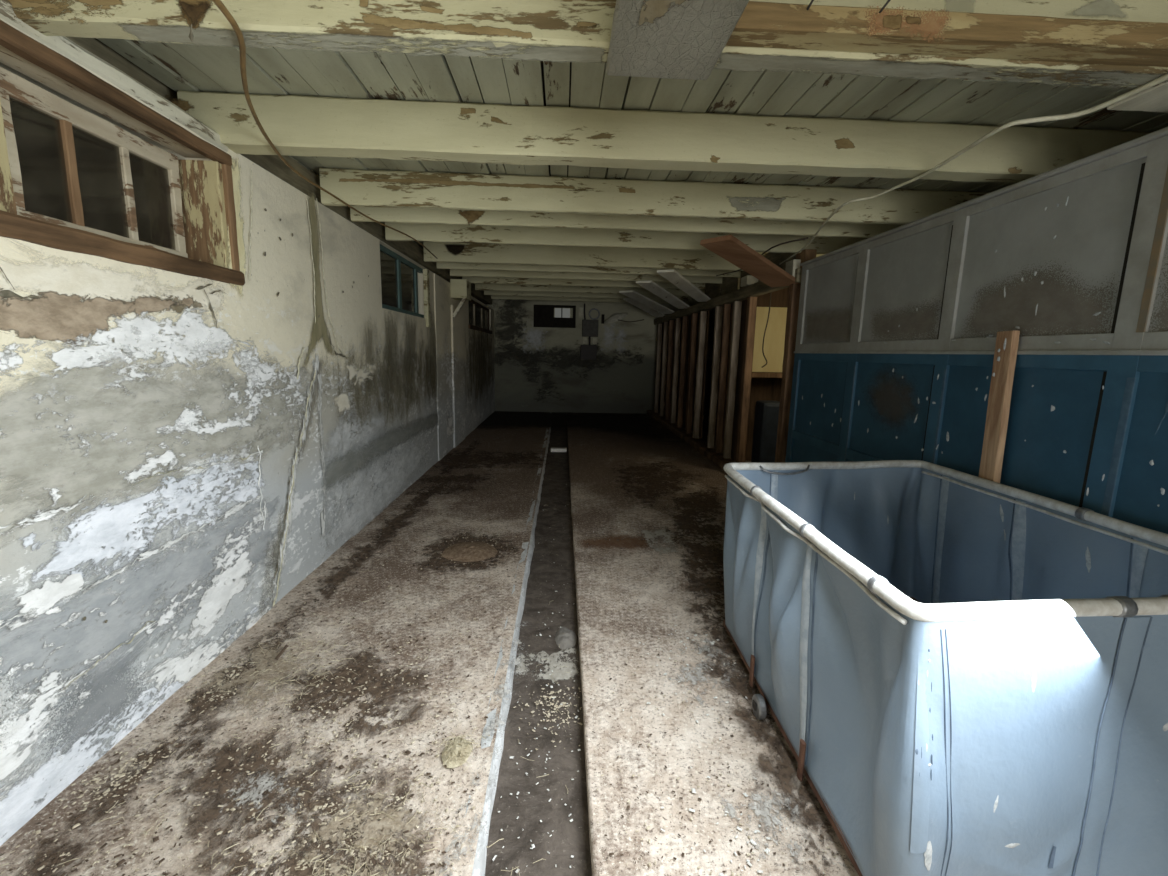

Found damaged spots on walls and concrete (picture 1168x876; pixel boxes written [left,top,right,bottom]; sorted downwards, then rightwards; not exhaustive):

peeling [165,95,193,112]
peeling [8,0,606,63]
peeling [339,178,575,189]
peeling [729,197,785,212]
peeling [835,138,855,149]
peeling [716,53,1168,88]
crack [260,195,347,615]
leakage [322,310,448,497]
leakage [464,299,685,445]
peeling [0,288,309,703]
leakage [472,622,579,791]
leakage [572,461,854,876]